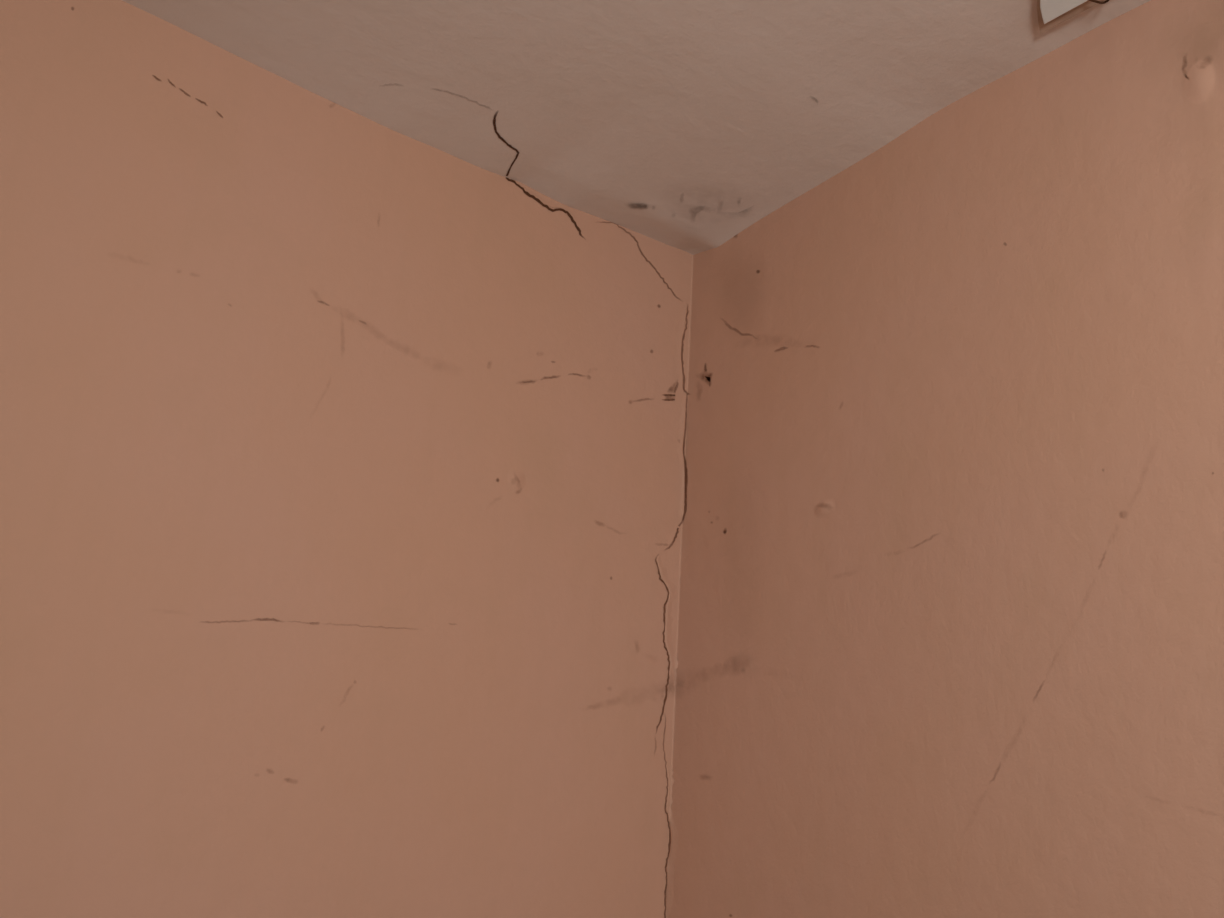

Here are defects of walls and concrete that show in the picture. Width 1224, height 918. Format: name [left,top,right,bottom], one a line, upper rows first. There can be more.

crack [493,114,582,237]
crack [640,250,689,729]
crack [664,762,679,918]